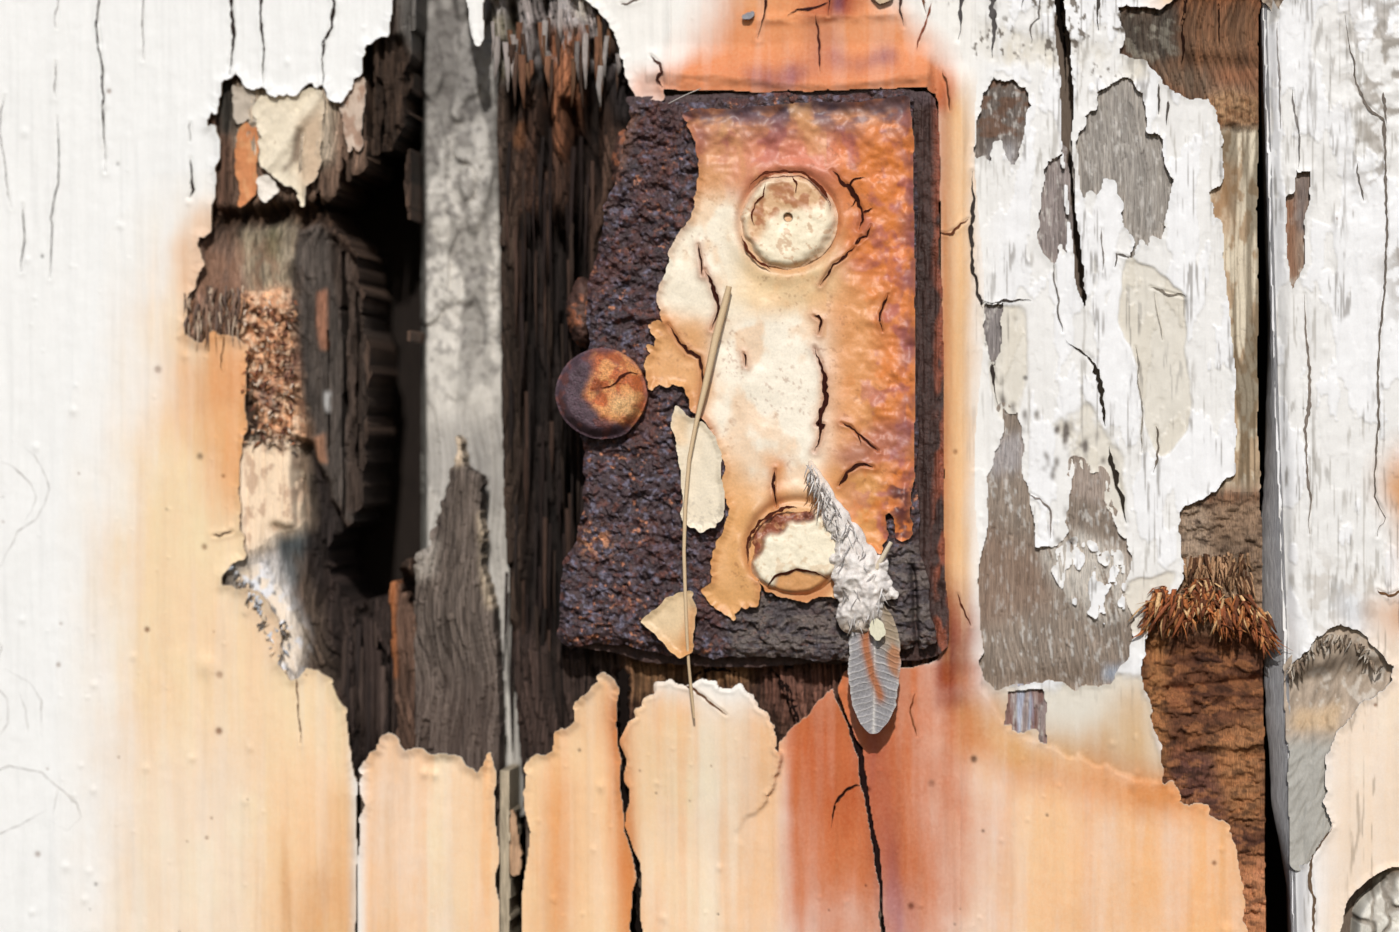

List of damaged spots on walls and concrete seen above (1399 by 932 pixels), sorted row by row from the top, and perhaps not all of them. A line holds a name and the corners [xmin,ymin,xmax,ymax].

crack [95,0,106,164]
crack [229,0,265,75]
peeling [232,77,366,207]
crack [321,0,335,83]
crack [758,0,830,67]
crack [899,0,1100,90]
spalling [342,165,422,596]
rust [626,88,955,660]
peeling [974,0,1393,932]
peeling [227,566,291,672]
rust [568,643,849,667]
crack [831,698,885,932]